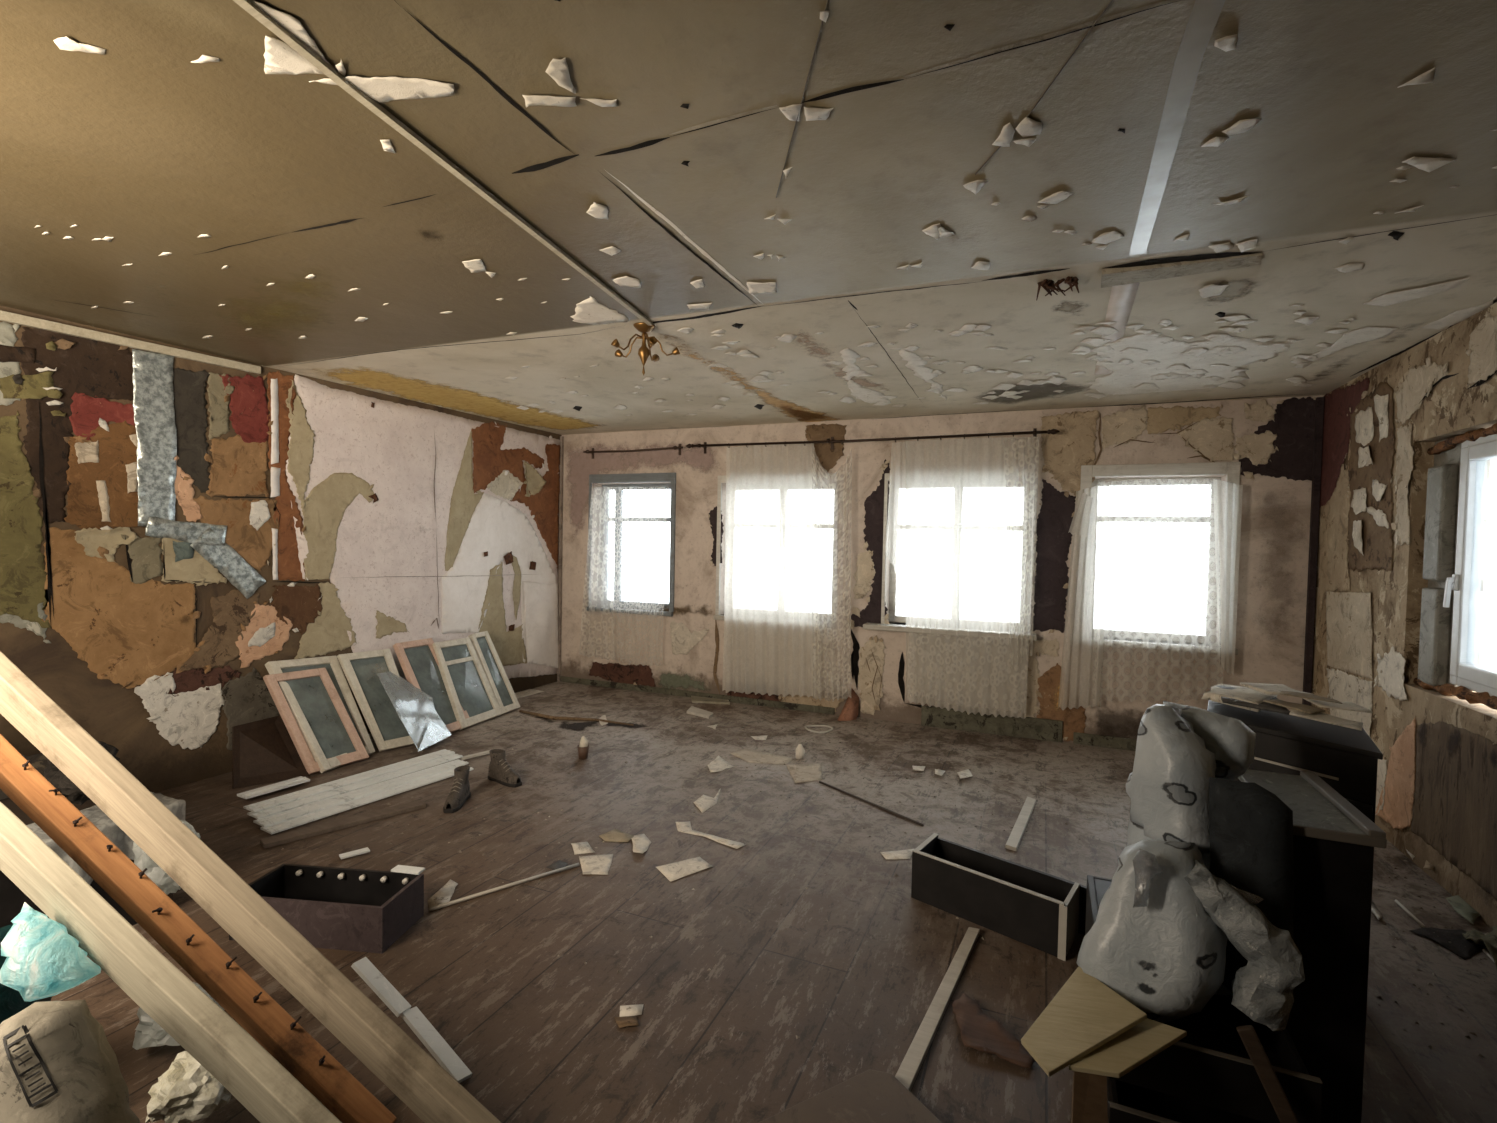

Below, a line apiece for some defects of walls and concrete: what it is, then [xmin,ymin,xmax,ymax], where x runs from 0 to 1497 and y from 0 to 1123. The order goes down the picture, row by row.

peeling [63,418,109,443]
flaking render [42,526,299,750]
crack [191,194,436,256]
peeling [687,279,712,310]
peeling [614,328,797,416]
damp [689,354,827,420]
flaking render [727,459,891,715]
crack [394,0,1497,465]
peeling [817,277,1497,741]
flaking render [1374,646,1497,901]